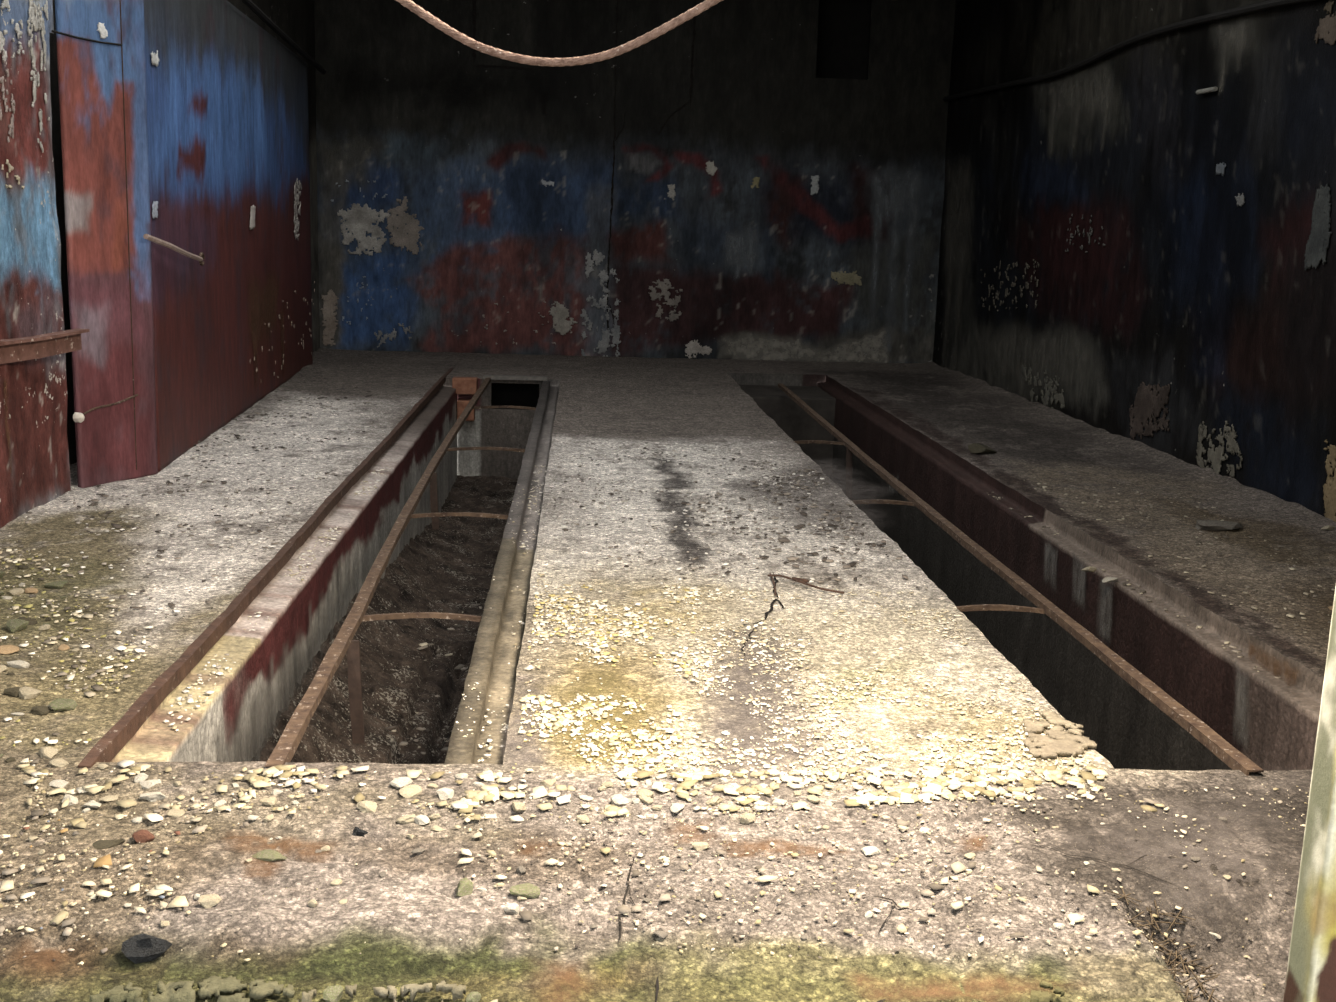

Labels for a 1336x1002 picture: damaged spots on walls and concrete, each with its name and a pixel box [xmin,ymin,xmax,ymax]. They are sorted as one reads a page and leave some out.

peeling [0,0,50,153]
peeling [331,179,424,256]
peeling [1304,183,1332,271]
peeling [533,249,621,357]
leakage [652,458,711,563]
spalling [0,276,1336,994]
crack [724,573,785,656]
spalling [89,975,357,1002]
crack [653,977,661,1002]